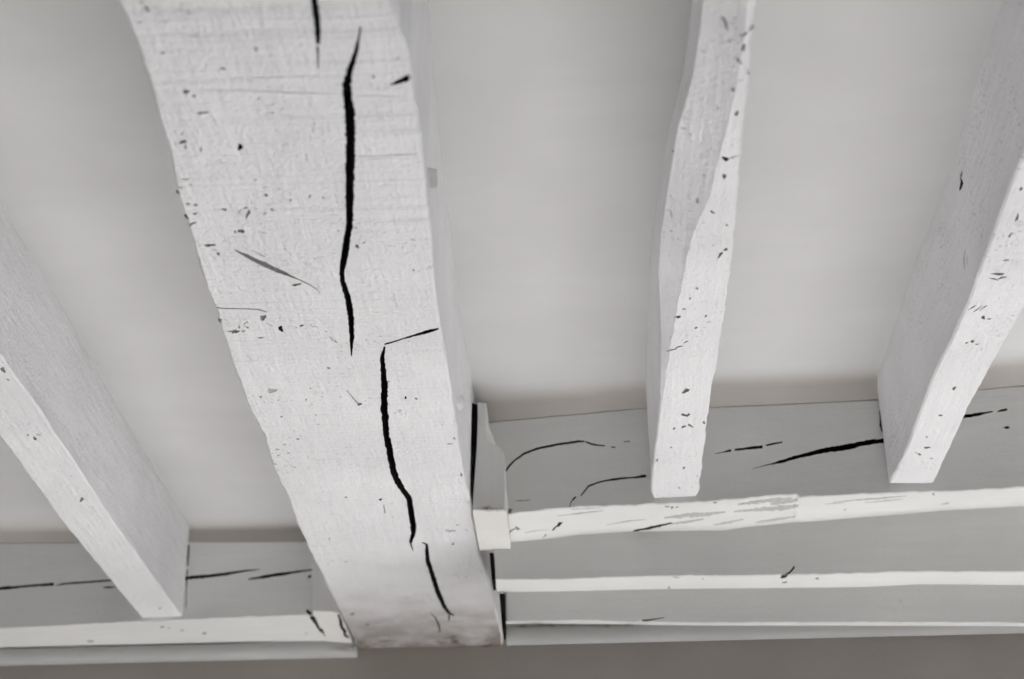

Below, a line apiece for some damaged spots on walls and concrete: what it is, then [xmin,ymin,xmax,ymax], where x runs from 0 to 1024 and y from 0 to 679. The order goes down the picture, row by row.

crack [311,0,321,68]
crack [339,26,410,356]
crack [506,440,630,472]
crack [715,438,884,469]
crack [347,328,454,634]
crack [569,475,646,507]
crack [0,579,114,590]
crack [185,569,312,580]